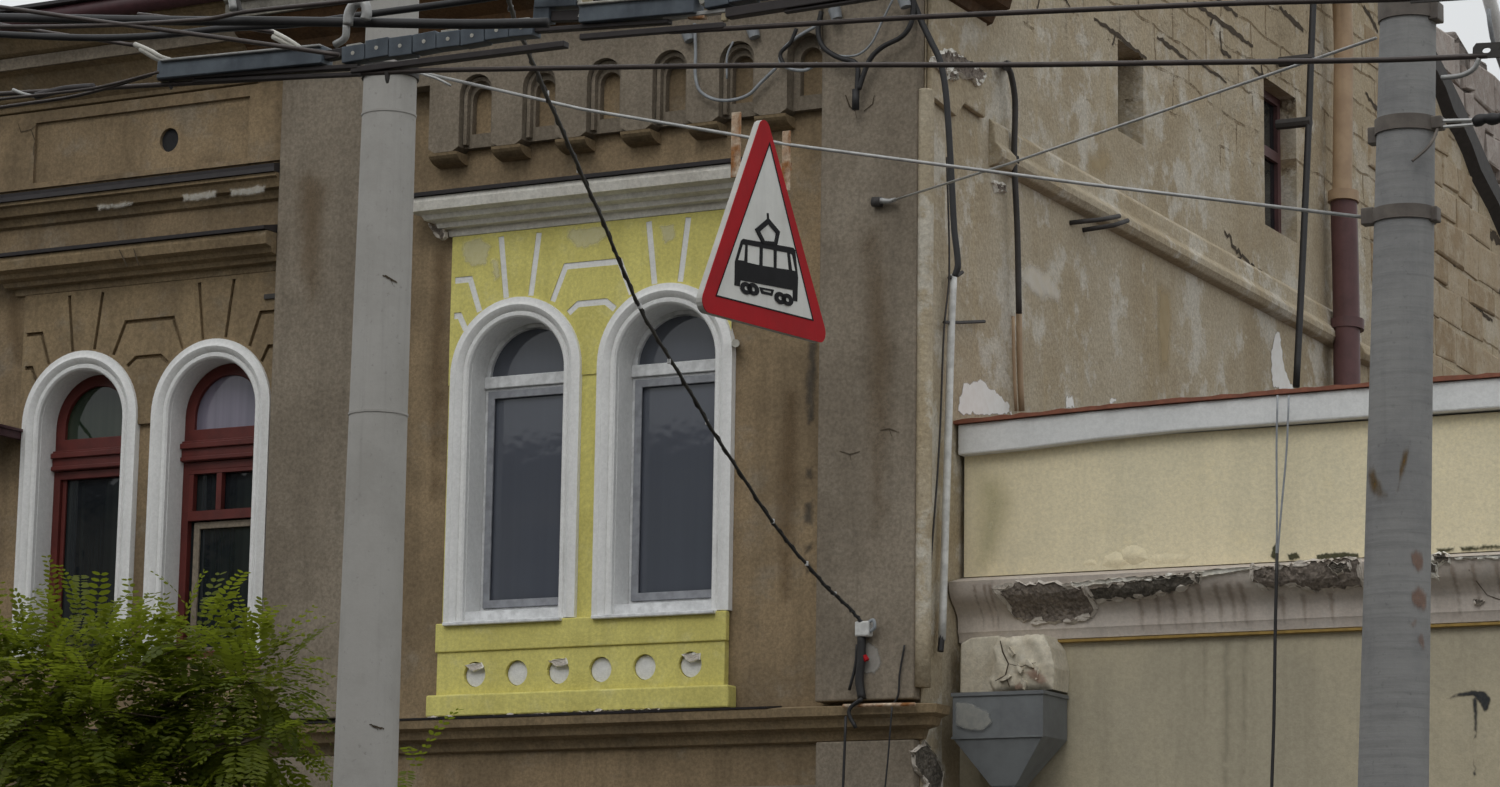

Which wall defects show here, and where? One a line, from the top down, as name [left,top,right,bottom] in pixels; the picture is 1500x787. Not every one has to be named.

flaking render [1431,551,1500,581]
flaking render [956,556,1364,730]
flaking render [909,740,944,787]